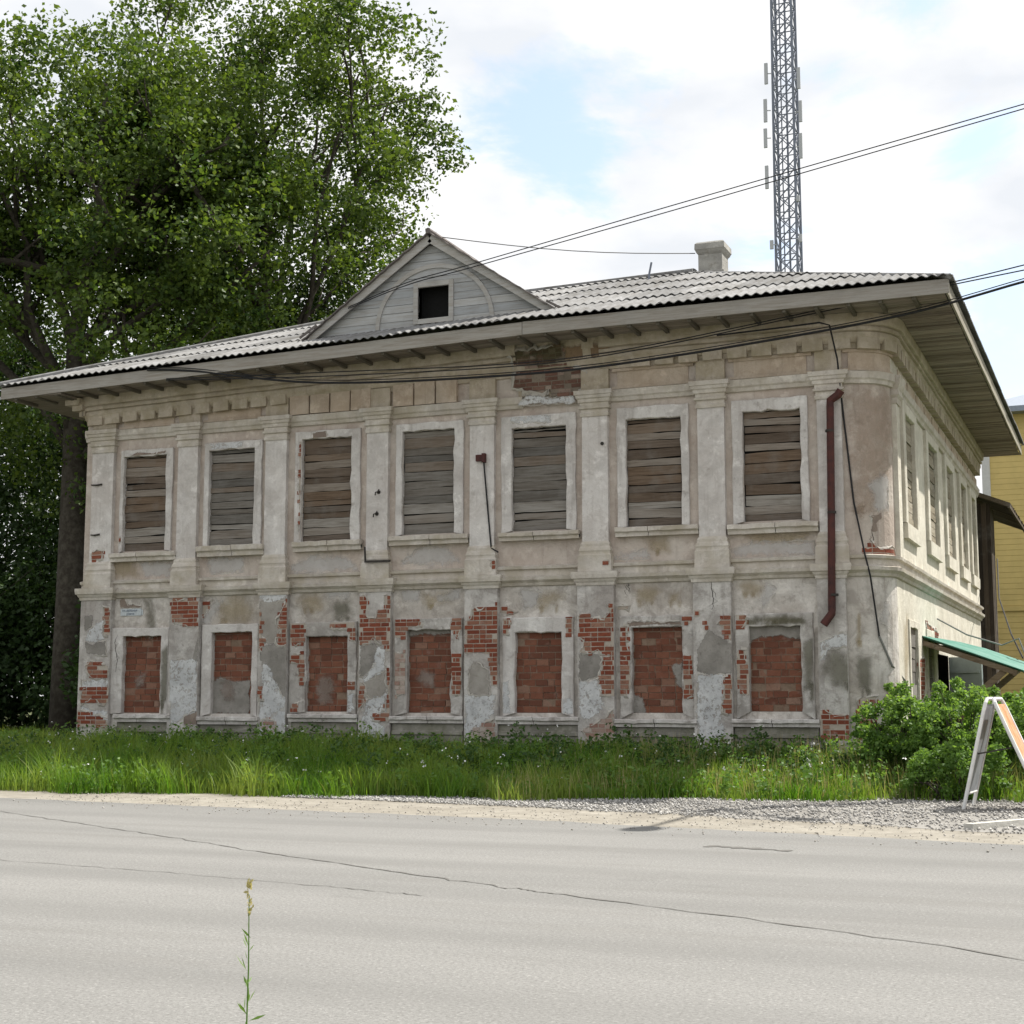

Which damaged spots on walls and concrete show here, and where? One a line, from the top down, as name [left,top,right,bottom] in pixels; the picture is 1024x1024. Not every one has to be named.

flaking render [506,344,588,425]
peeling [862,477,896,556]
flaking render [170,597,210,630]
flaking render [77,659,109,729]
peeling [257,595,307,736]
flaking render [329,594,424,741]
flaking render [450,589,542,744]
flaking render [563,604,749,748]
flaking render [820,694,880,744]